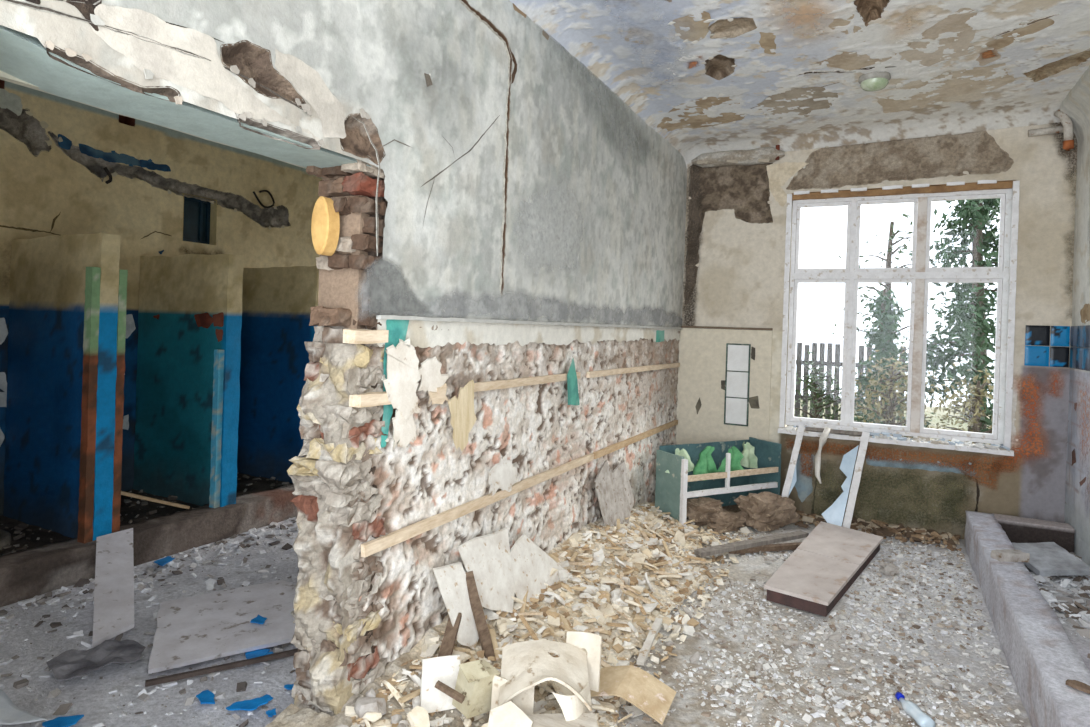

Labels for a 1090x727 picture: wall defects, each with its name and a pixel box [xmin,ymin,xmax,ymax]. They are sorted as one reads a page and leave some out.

spalling [0,88,291,229]
crack [2,0,303,110]
peeling [45,0,385,165]
crack [421,0,517,296]
peeling [657,93,745,132]
spalling [701,54,737,80]
peeling [668,11,776,55]
peeling [757,87,838,121]
peeling [811,0,1090,113]
spalling [684,131,1014,307]
peeling [381,319,449,450]
corrosion [786,374,1061,489]